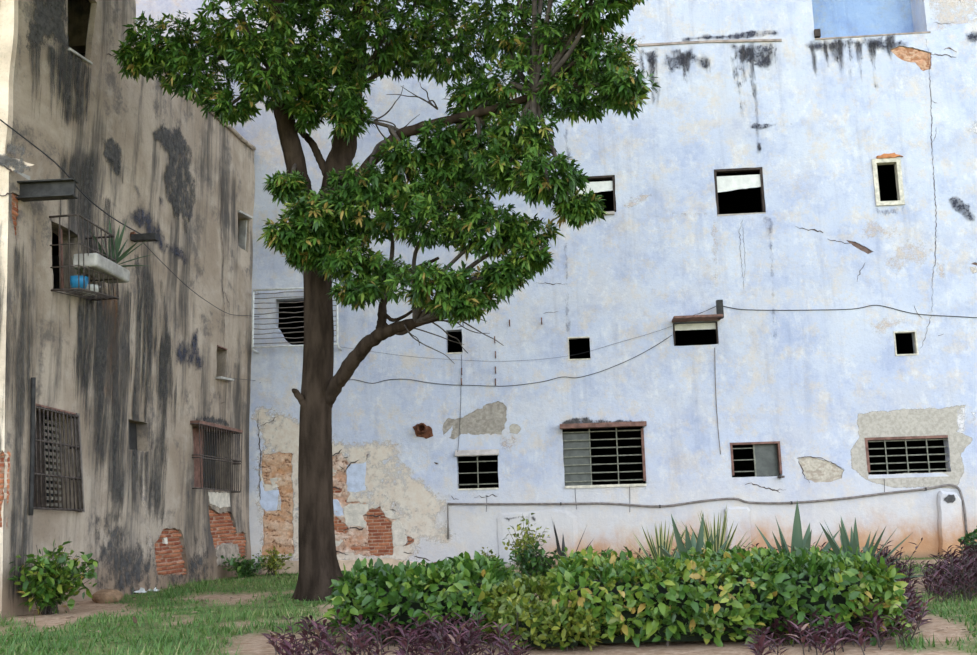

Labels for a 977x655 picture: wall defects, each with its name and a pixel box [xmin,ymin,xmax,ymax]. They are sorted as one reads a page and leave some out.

damp [809,36,902,65]
spalling [891,46,956,71]
damp [153,125,195,235]
damp [134,208,186,263]
mould [950,198,975,221]
flaking render [413,401,521,446]
flaking render [0,448,11,529]
flaking render [154,529,186,575]
flaking render [208,492,246,566]
peeling [253,407,299,561]
peeling [332,441,452,563]
flaking render [798,456,844,483]